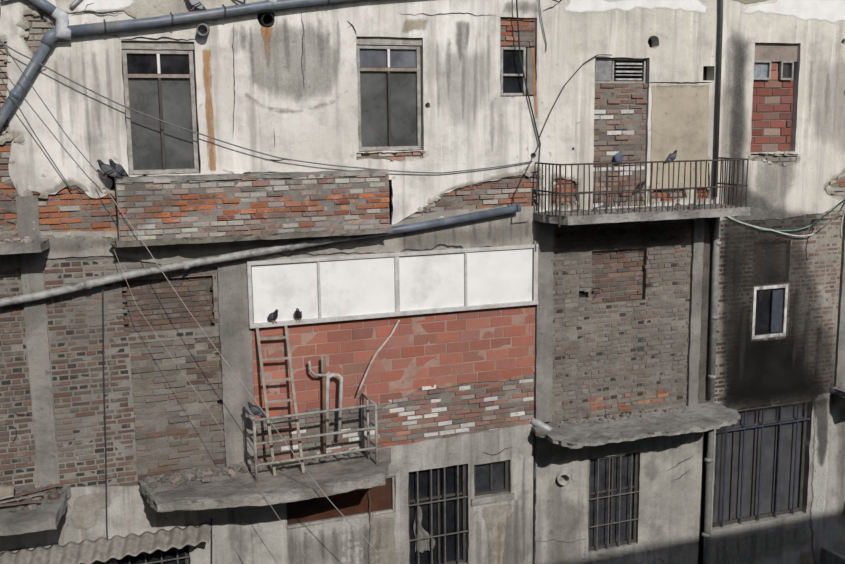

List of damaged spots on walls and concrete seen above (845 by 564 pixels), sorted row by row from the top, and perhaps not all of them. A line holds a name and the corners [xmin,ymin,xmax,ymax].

spalling [0,38,9,109]
rust [203,50,216,170]
crack [229,27,237,131]
spalling [0,118,117,239]
spalling [398,167,580,223]
spalling [824,170,845,195]